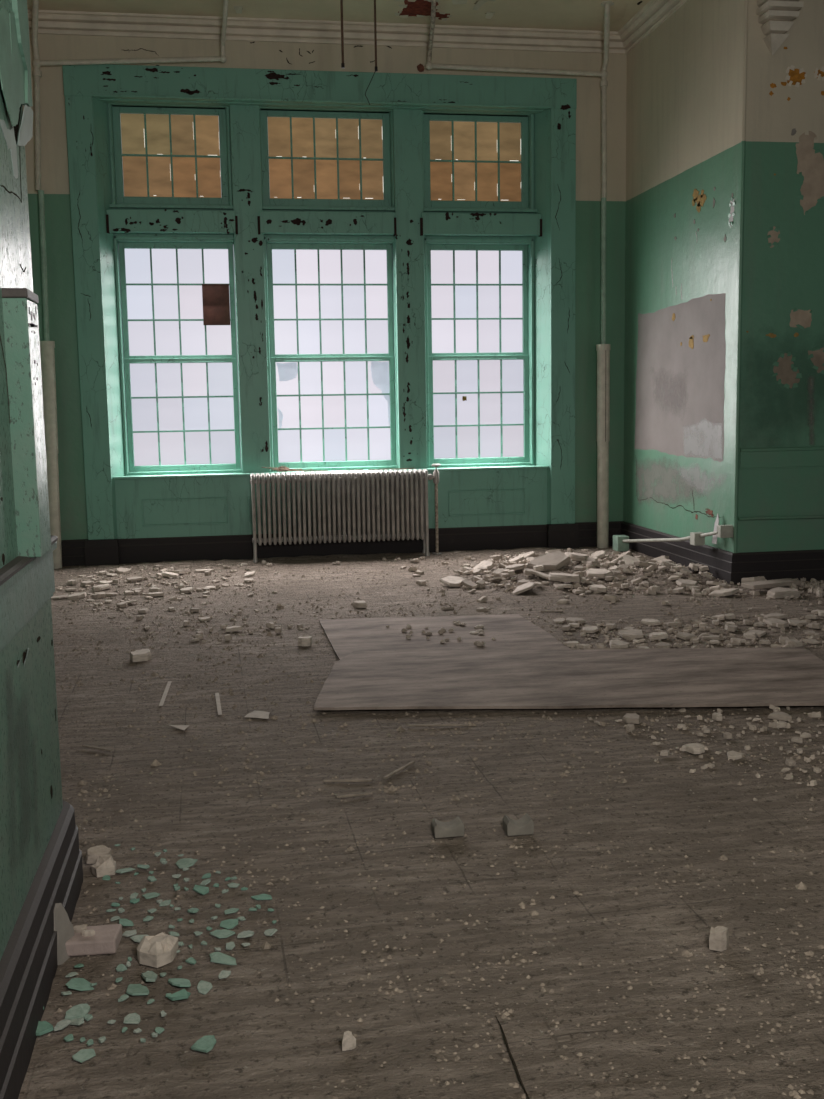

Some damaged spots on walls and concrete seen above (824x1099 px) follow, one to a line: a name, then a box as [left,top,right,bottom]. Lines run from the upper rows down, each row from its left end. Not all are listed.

peeling [0,0,33,179]
spalling [265,71,320,88]
spalling [769,65,824,101]
peeling [791,128,824,215]
flaking render [635,293,726,462]